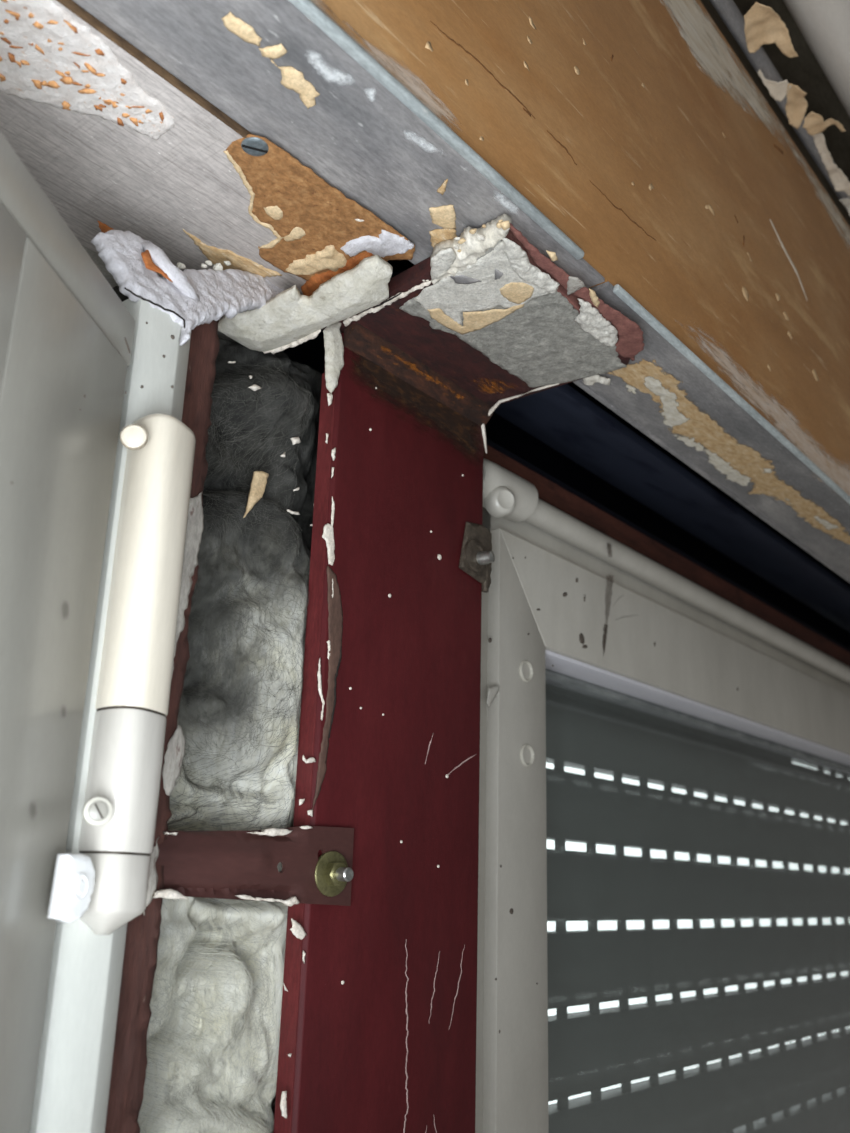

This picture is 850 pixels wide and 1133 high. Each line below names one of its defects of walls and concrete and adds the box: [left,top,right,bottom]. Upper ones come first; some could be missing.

spalling [0,0,175,140]
peeling [222,12,320,109]
crack [430,20,655,240]
peeling [744,2,798,58]
peeling [757,69,850,215]
peeling [91,134,415,346]
spalling [263,329,321,354]
corrosion [353,346,482,459]
peeling [343,205,850,545]
peeling [299,497,343,817]
peeling [143,836,160,916]